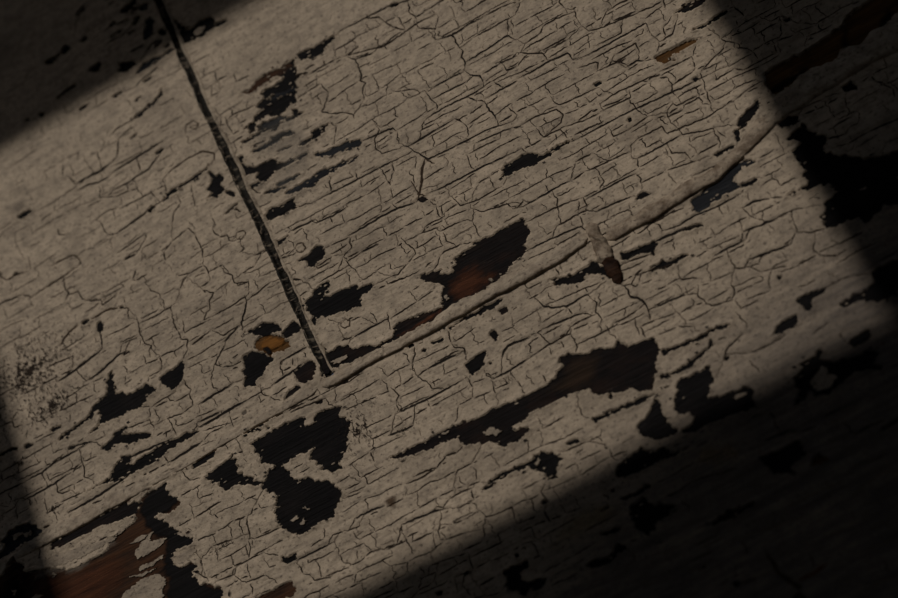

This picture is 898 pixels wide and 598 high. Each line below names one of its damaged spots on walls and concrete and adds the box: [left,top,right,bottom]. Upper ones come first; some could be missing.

peeling [148,165,238,214]
peeling [230,36,362,223]
peeling [714,100,760,157]
peeling [778,116,898,228]
crack [798,59,898,155]
peeling [286,218,531,399]
crack [0,430,135,519]
peeling [0,482,230,598]
peeling [51,361,199,490]
crack [180,471,282,598]
peeling [186,400,351,535]
peeling [390,324,756,492]